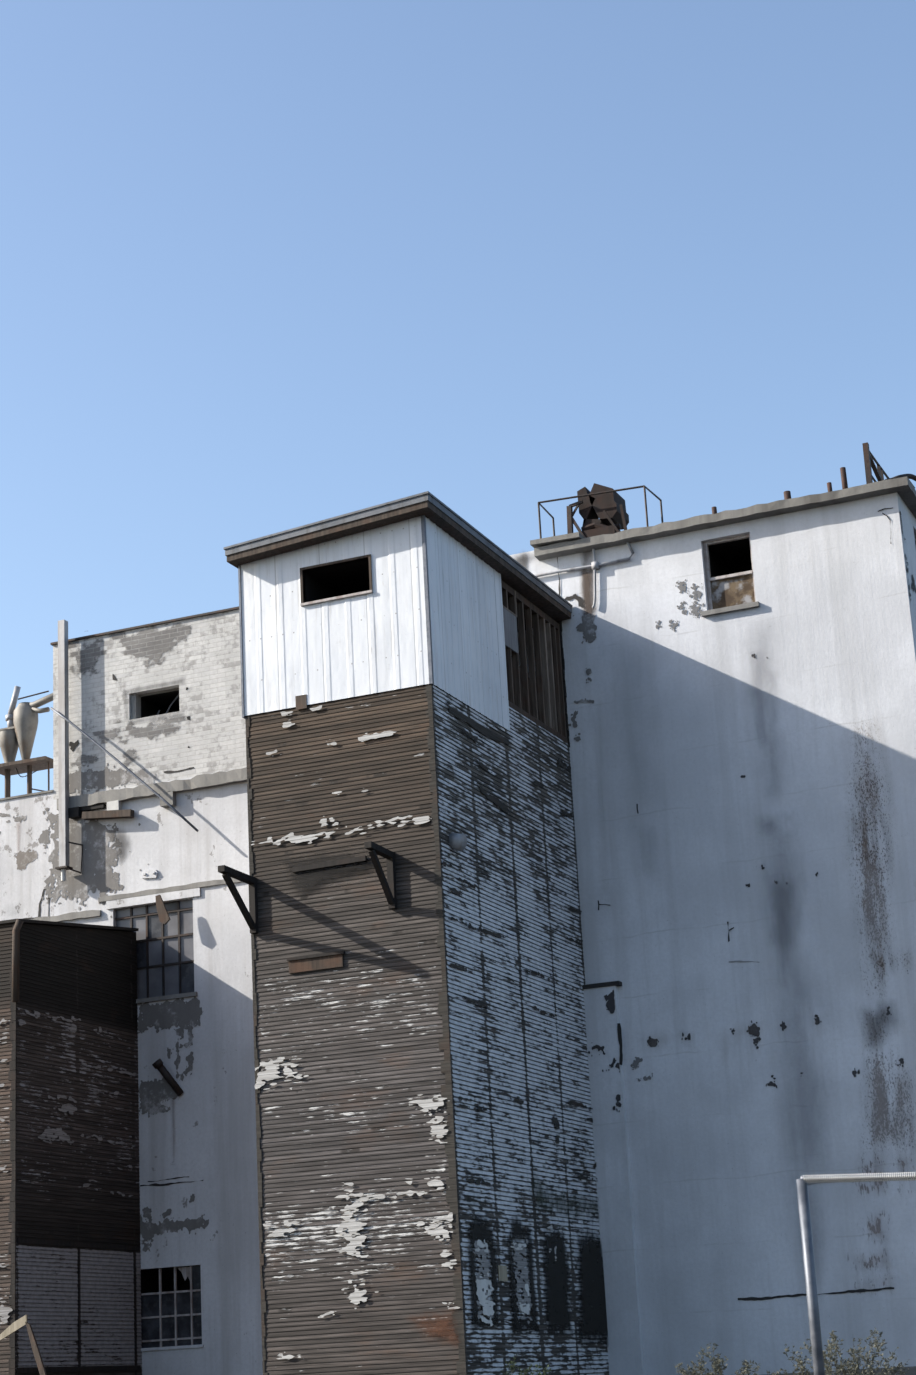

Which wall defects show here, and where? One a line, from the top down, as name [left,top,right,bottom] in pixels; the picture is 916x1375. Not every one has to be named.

peeling [655,579,704,632]
peeling [68,623,191,674]
flaking render [69,716,190,796]
peeling [0,813,26,834]
flaking render [14,808,131,917]
peeling [447,917,506,938]
peeling [604,990,615,1014]
peeling [588,1036,659,1082]
spalling [730,1020,761,1049]
peeling [568,1098,593,1123]
peeling [473,1239,495,1326]
peeling [510,1235,532,1324]